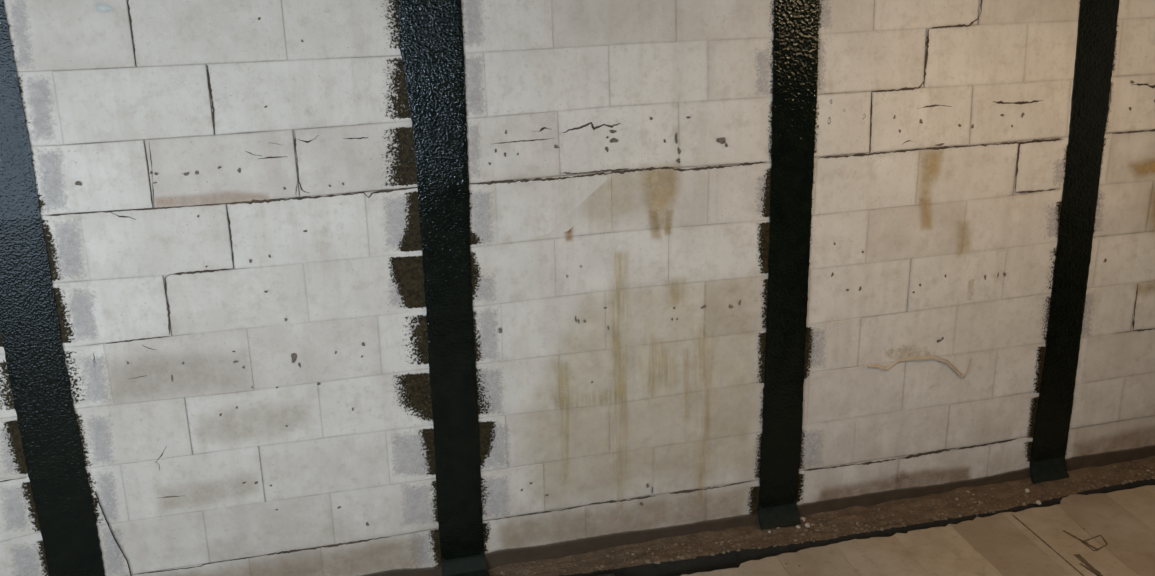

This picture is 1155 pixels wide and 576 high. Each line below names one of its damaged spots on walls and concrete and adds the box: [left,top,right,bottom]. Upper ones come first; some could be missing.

crack [818,0,1064,193]
crack [494,122,620,144]
crack [470,162,765,185]